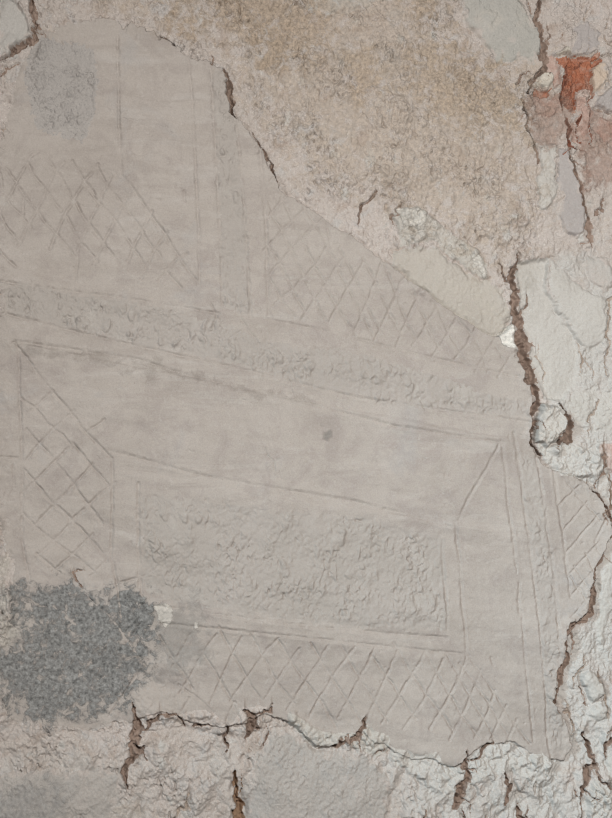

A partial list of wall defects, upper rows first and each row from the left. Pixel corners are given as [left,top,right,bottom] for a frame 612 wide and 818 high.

flaking render [23,37,100,144]
crack [516,0,612,248]
flaking render [209,66,253,314]
flaking render [537,444,604,483]
crack [499,255,612,818]
damp [0,557,173,733]
crack [120,702,273,818]
flaking render [144,705,271,737]
crack [332,717,385,754]
flaking render [287,713,556,797]
crack [452,742,495,818]